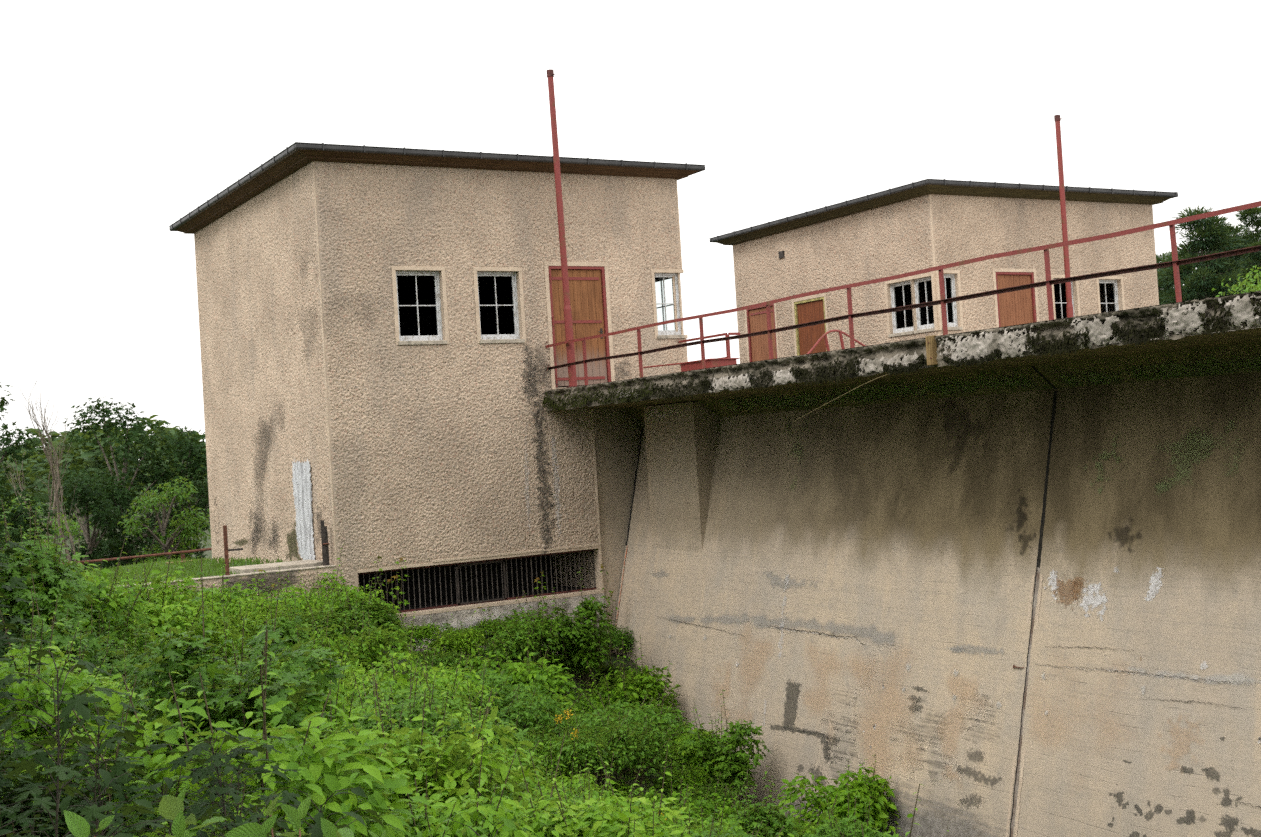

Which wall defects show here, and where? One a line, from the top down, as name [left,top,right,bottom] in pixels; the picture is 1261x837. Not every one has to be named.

damp [522,346,555,553]
corrosion [1053,578,1084,604]
damp [771,682,839,786]
damp [874,751,1001,837]
damp [1108,791,1195,837]
damp [1181,766,1261,837]